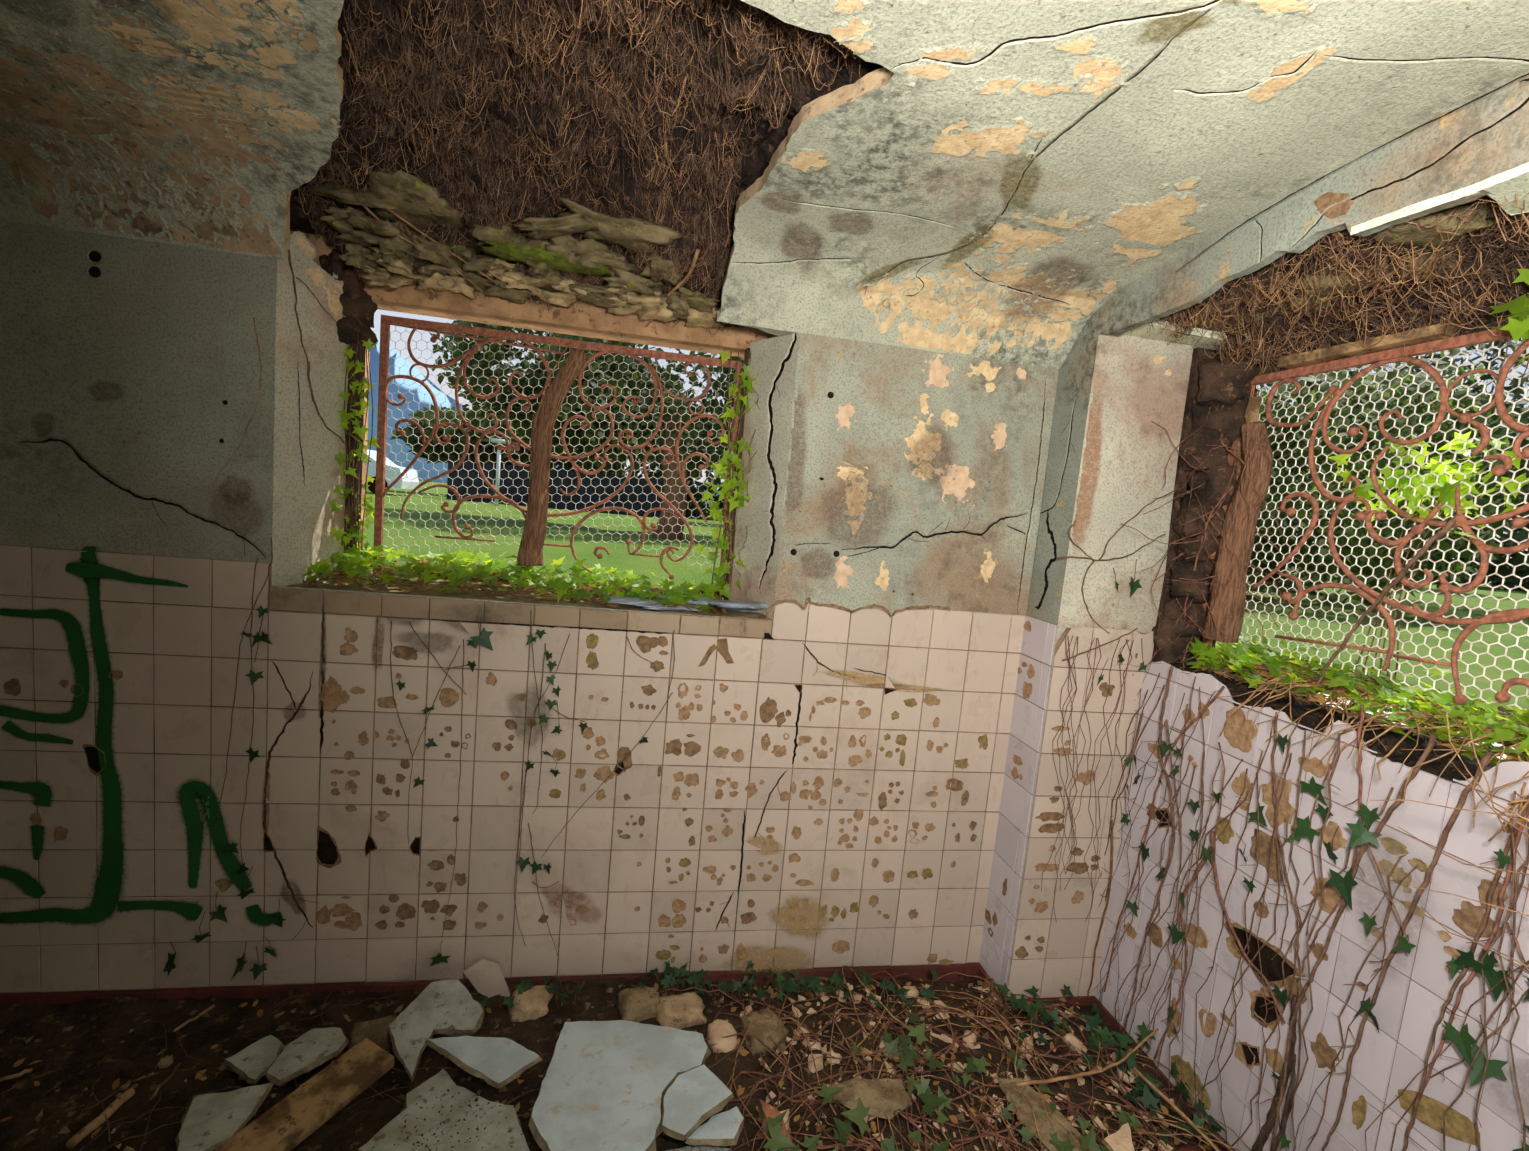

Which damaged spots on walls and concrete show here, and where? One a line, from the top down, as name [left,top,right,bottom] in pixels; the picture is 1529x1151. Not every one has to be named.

peeling [0,0,346,330]
peeling [824,0,879,56]
crack [732,0,1529,305]
crack [14,434,269,558]
crack [757,333,1076,615]
peeling [854,176,1210,509]
crack [262,611,325,940]
spalling [316,825,341,868]
spalling [316,836,466,931]
spalling [552,727,645,839]
spalling [655,682,988,963]
spalling [1167,901,1307,1075]